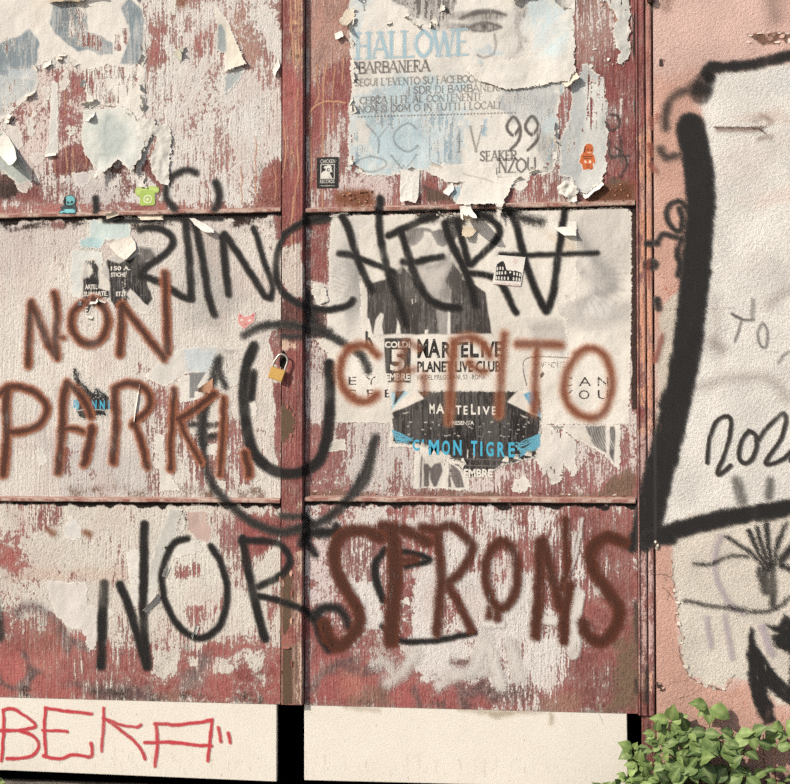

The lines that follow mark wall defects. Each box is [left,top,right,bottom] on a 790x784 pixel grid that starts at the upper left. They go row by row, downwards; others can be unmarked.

spalling [746,32,790,45]